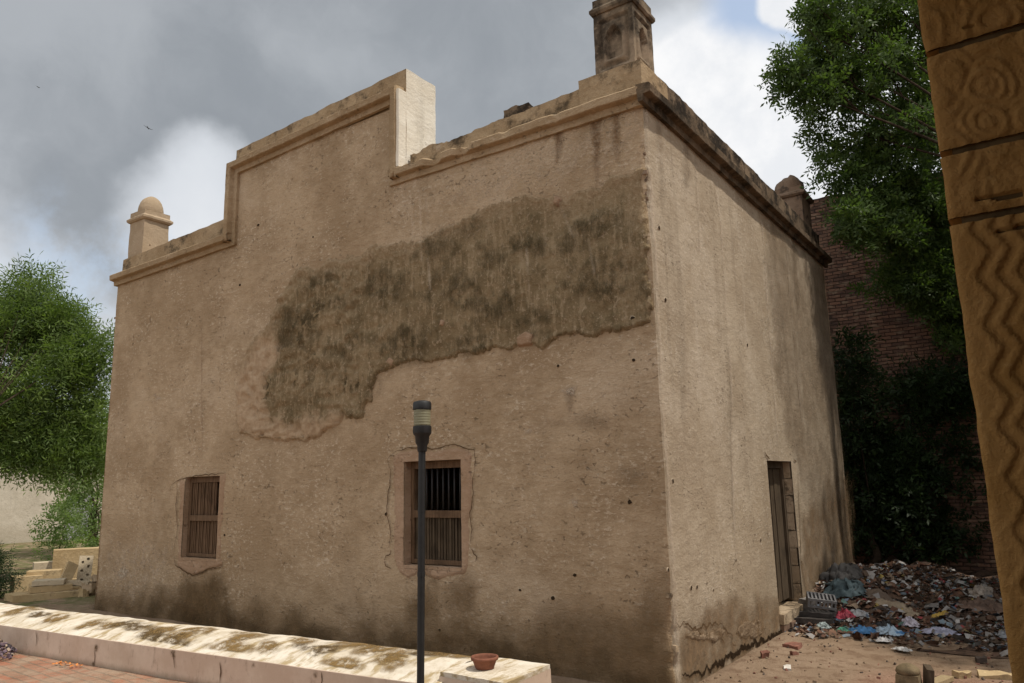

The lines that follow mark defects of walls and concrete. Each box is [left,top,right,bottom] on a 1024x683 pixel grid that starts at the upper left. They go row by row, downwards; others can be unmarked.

crack [384,444,477,569]
leakage [152,586,215,626]
leakage [282,615,326,640]
leakage [477,625,590,666]
crack [677,621,782,677]